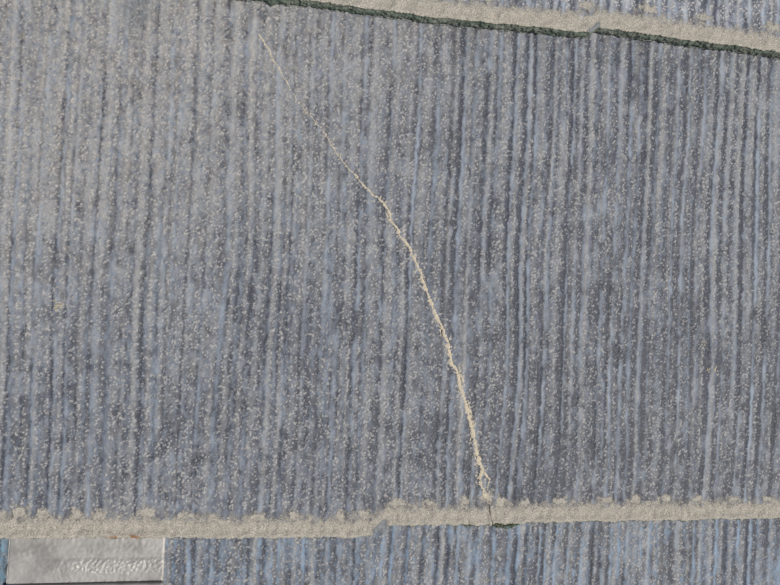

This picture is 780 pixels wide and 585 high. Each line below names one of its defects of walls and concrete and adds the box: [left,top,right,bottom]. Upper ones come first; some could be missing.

crack [257,32,493,525]